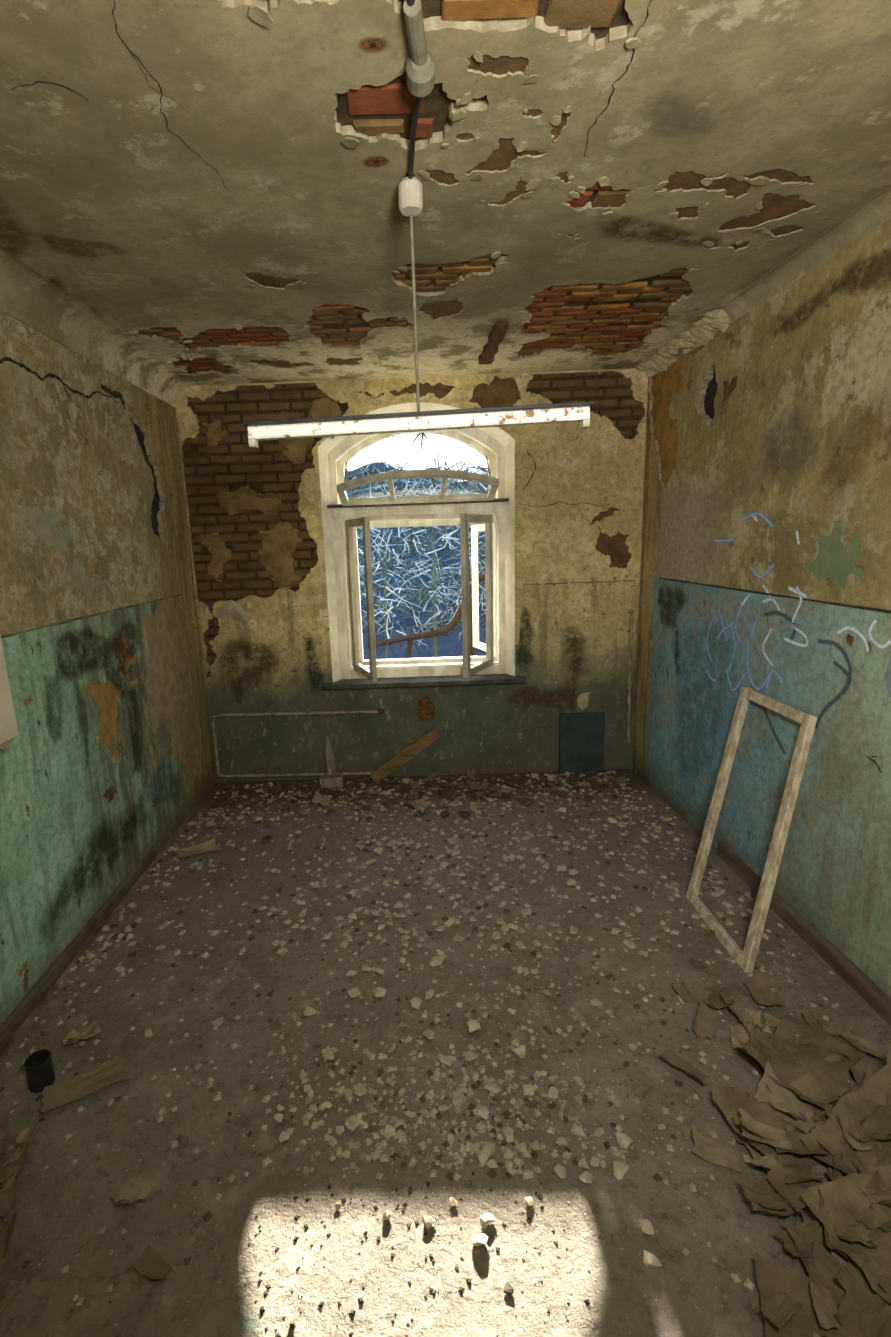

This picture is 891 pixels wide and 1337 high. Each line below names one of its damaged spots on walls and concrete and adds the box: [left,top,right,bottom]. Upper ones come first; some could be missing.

crack [112,1,224,185]
spalling [219,0,341,27]
spalling [333,70,489,151]
peeling [465,51,540,83]
spalling [386,0,641,51]
crack [584,0,652,157]
peeling [418,105,815,252]
crack [0,357,125,409]
spalling [469,268,738,488]
spalling [121,252,509,685]
spalling [587,507,632,573]
peeling [82,630,140,762]